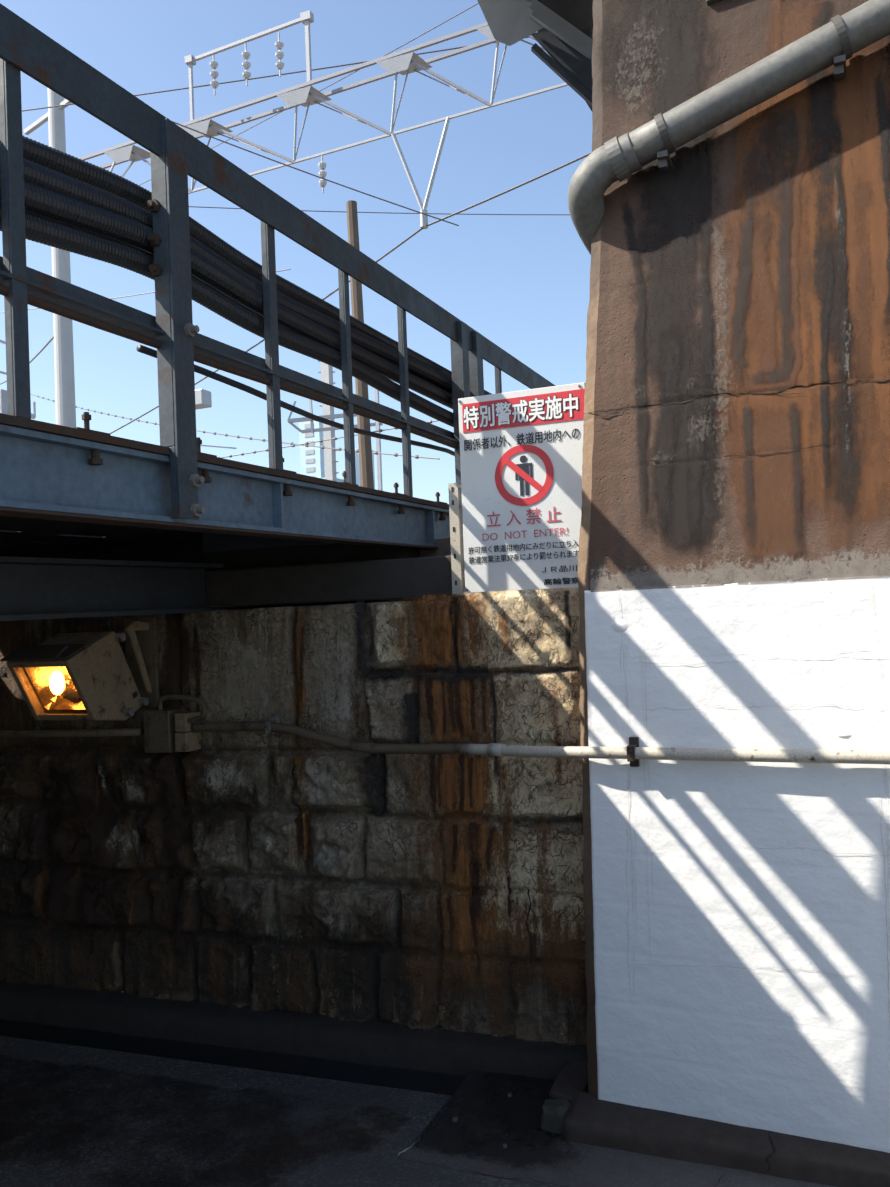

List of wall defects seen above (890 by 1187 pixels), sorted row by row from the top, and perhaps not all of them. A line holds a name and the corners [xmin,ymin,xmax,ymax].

water stain [597,0,711,120]
corrosion [767,0,822,52]
water stain [808,0,831,34]
water stain [623,129,721,551]
crack [584,378,890,417]
corrosion [717,36,890,562]
water stain [806,66,860,513]
water stain [876,76,890,323]
corrosion [291,612,311,867]
corrosion [388,594,586,999]